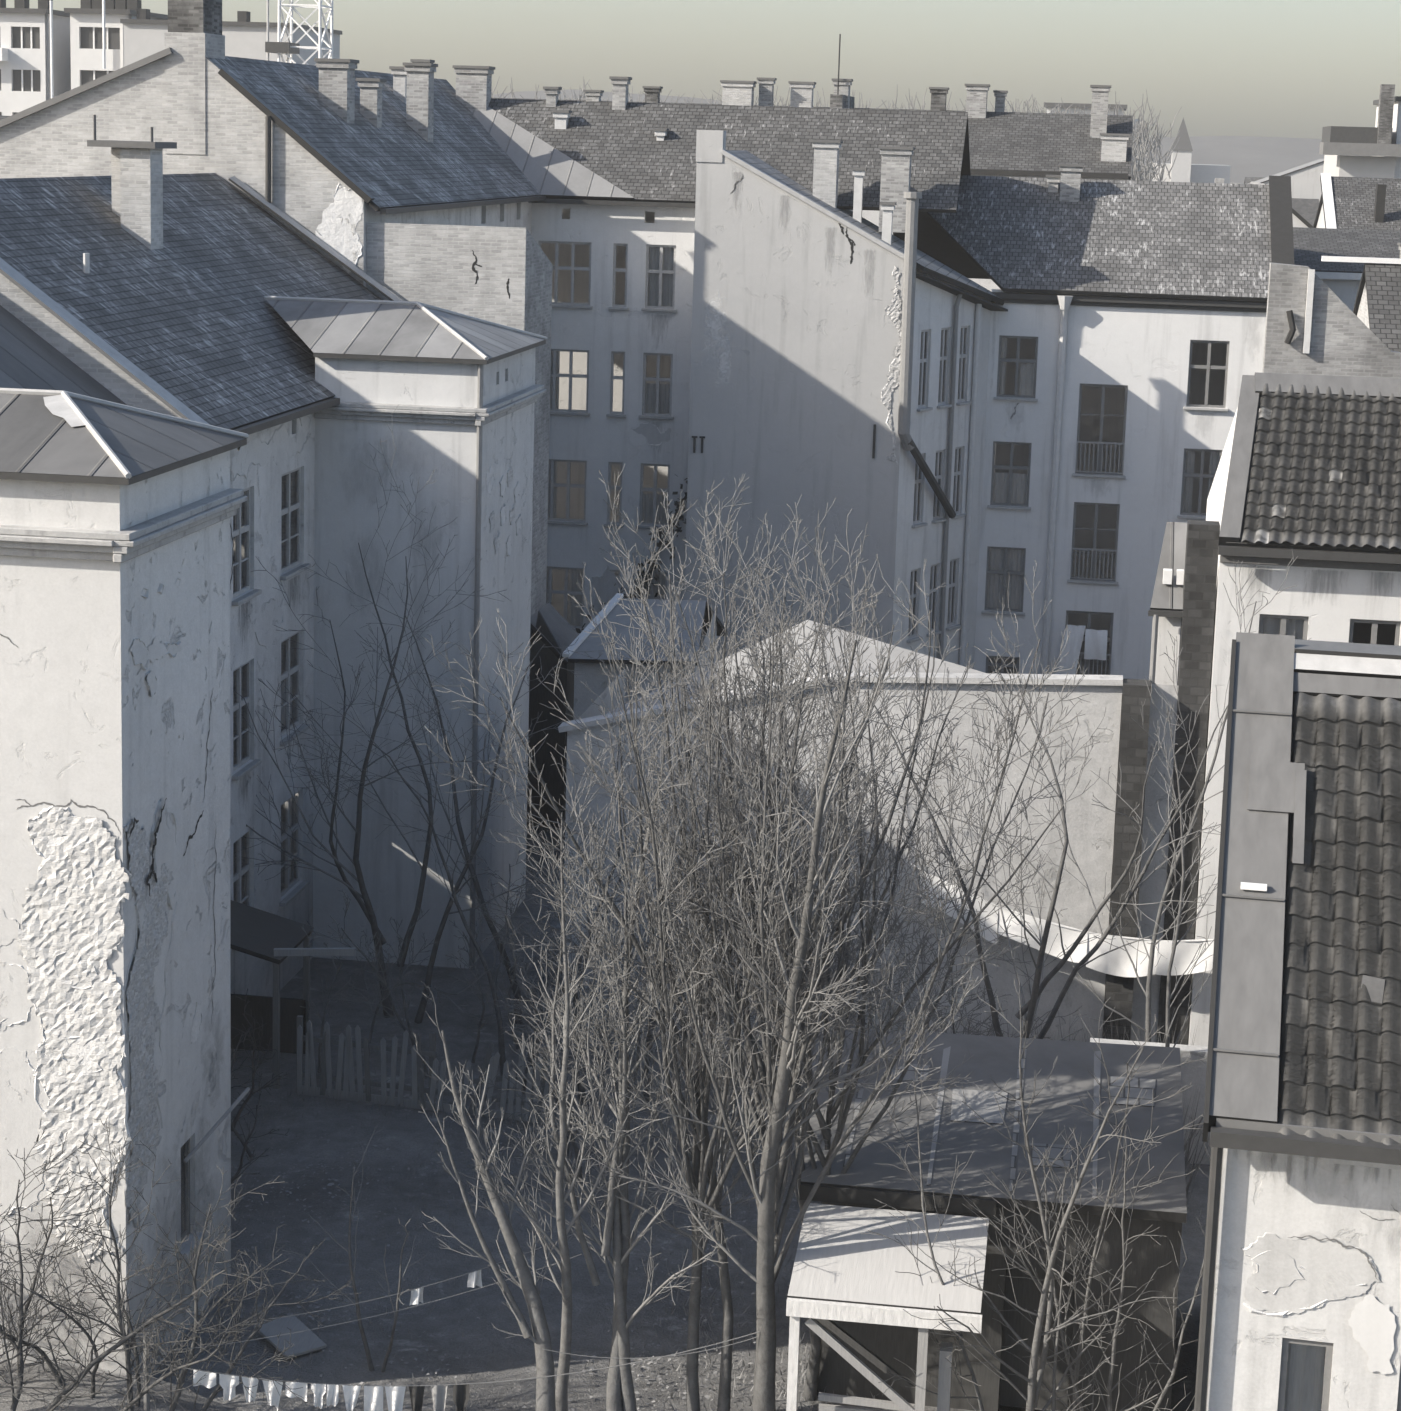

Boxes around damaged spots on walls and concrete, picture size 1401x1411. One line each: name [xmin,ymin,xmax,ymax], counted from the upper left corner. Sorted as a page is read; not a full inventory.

peeling [315,183,363,273]
crack [472,250,510,299]
crack [17,691,217,1018]
spalling [0,798,179,1262]
crack [1288,1208,1401,1280]
peeling [1242,1281,1334,1318]